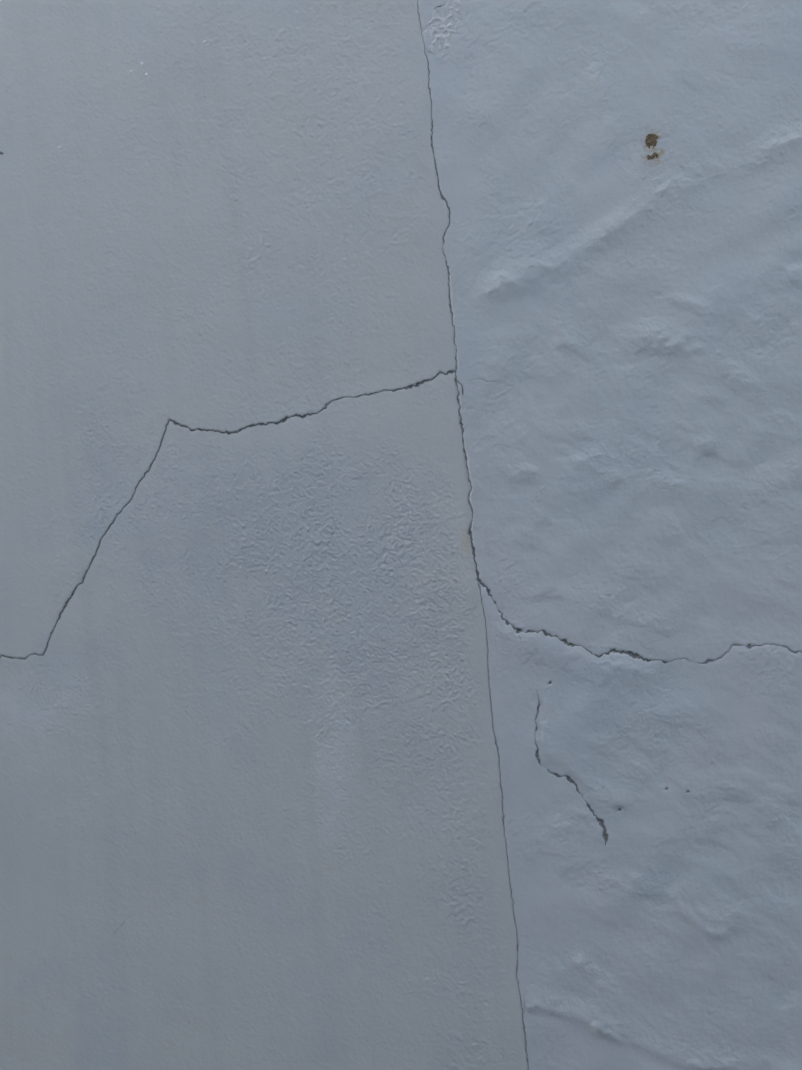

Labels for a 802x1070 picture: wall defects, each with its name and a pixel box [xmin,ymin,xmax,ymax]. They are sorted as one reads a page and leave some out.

corrosion [637,126,666,171]
crack [0,397,343,660]
crack [355,2,800,1069]